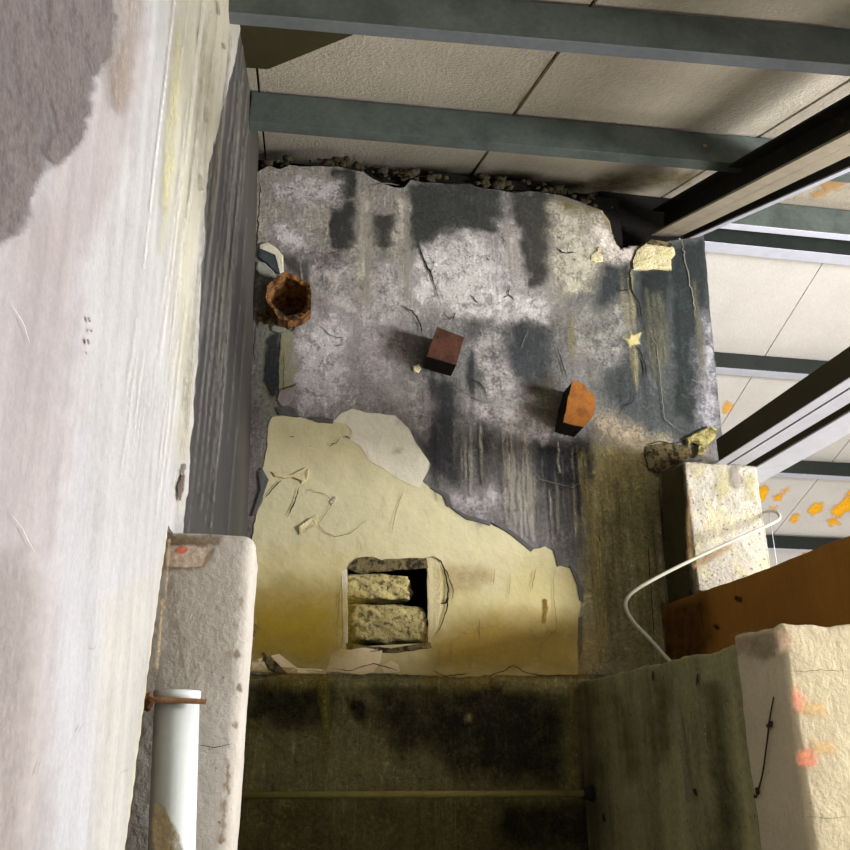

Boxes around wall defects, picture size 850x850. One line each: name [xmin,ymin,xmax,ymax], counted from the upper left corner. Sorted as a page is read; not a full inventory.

damp [0,0,142,241]
crack [418,239,455,322]
spalling [632,239,675,271]
crack [682,242,697,321]
damp [264,169,720,649]
crack [617,239,689,478]
crack [287,488,372,537]
flaking render [250,310,584,677]
crack [427,556,573,677]
damp [237,680,337,762]
damp [381,684,574,788]
damp [218,761,230,844]